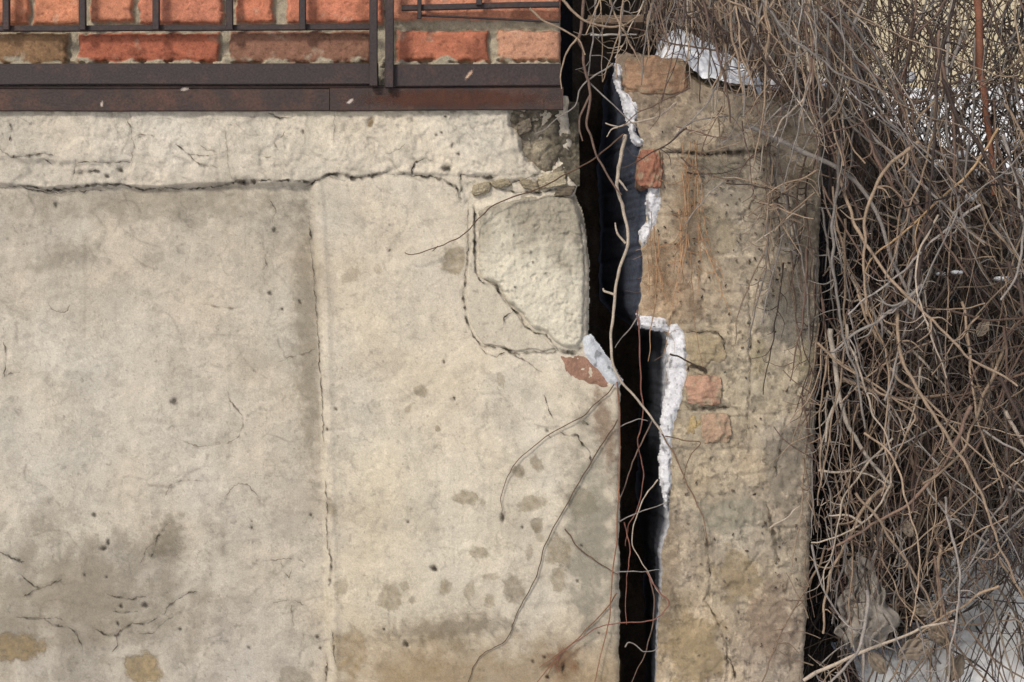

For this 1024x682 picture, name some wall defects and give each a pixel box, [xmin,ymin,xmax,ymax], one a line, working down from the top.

spalling [472,102,580,197]
peeling [612,63,644,146]
crack [9,113,581,360]
peeling [638,187,661,246]
crack [287,229,324,433]
spalling [561,355,608,387]
peeling [636,313,687,508]